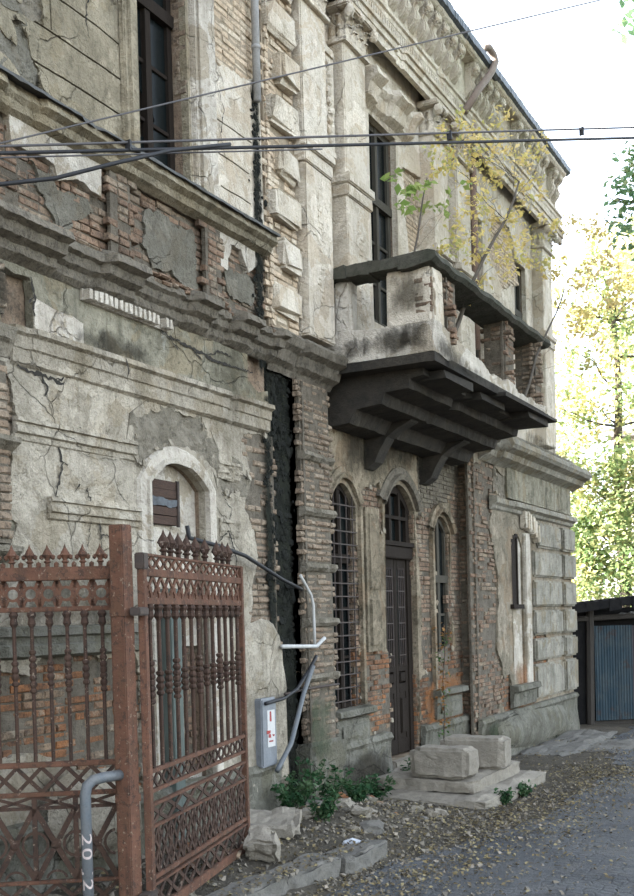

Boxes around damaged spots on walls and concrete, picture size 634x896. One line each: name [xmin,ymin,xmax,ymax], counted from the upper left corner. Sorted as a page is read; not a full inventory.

spalling [0,0,49,92]
flaking render [0,112,53,223]
leakage [252,84,262,222]
flaking render [55,168,108,250]
flaking render [130,188,203,292]
flaking render [221,249,265,317]
leakage [255,252,265,320]
crack [17,364,65,396]
crack [161,330,253,373]
crack [55,447,91,501]
crack [83,522,109,547]
leakage [259,359,298,802]